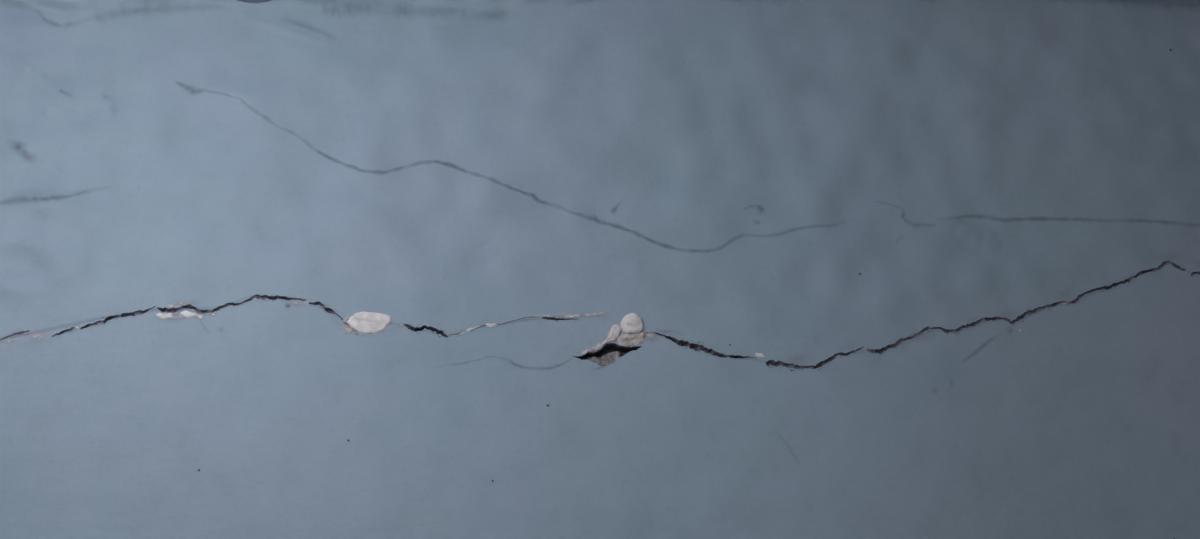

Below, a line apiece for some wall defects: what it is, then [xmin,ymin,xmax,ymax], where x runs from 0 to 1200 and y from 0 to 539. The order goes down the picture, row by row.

crack [0,293,355,343]
spalling [342,312,391,334]
crack [400,312,604,338]
spalling [572,313,653,368]
crack [646,259,1200,371]